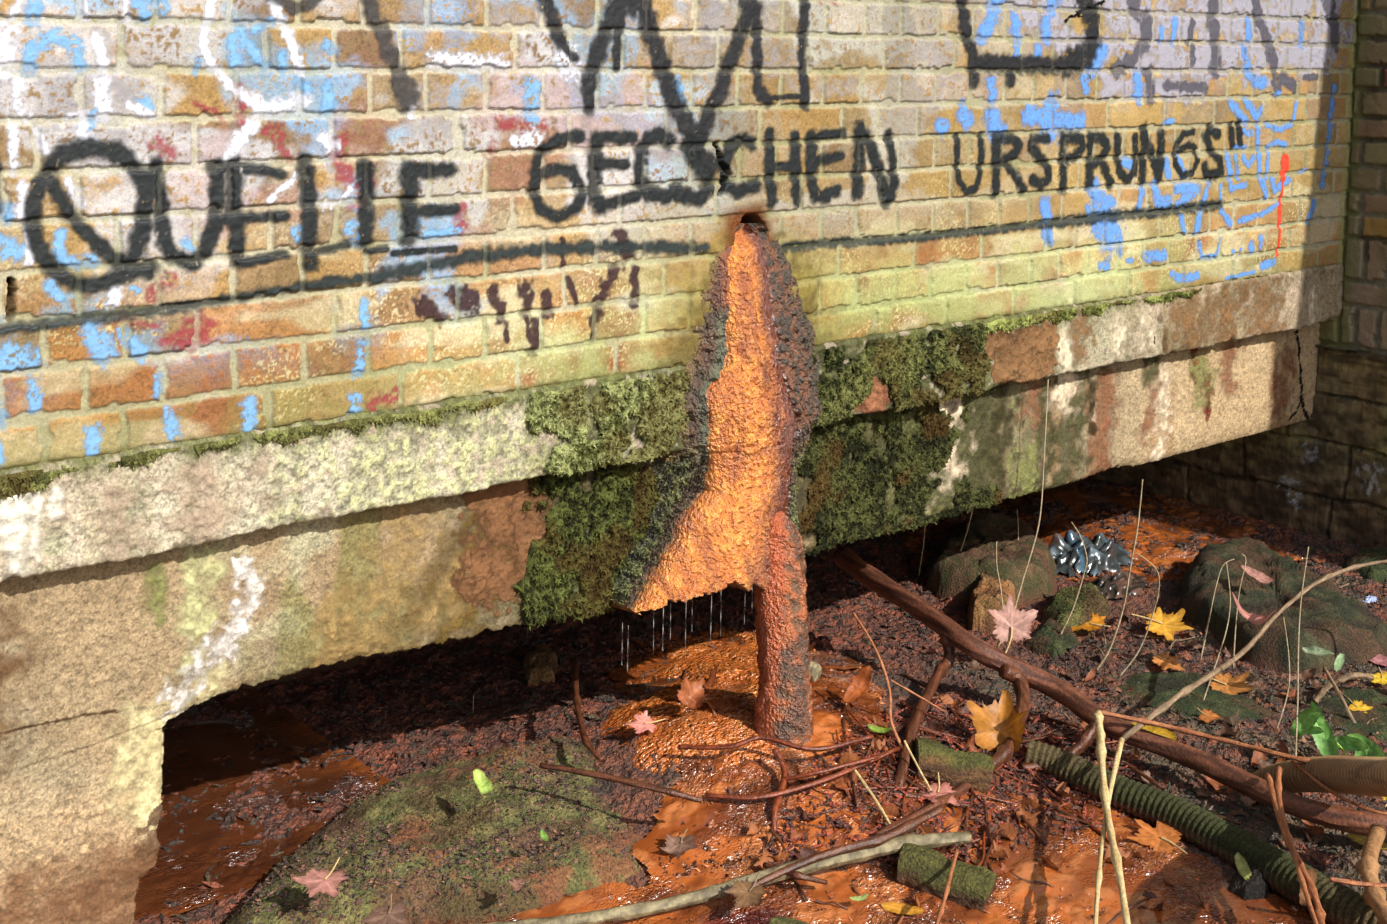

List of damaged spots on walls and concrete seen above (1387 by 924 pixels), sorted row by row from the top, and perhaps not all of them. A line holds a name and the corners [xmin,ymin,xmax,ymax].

rust [728,208,773,246]
crack [1289,330,1309,421]
crack [3,706,145,734]